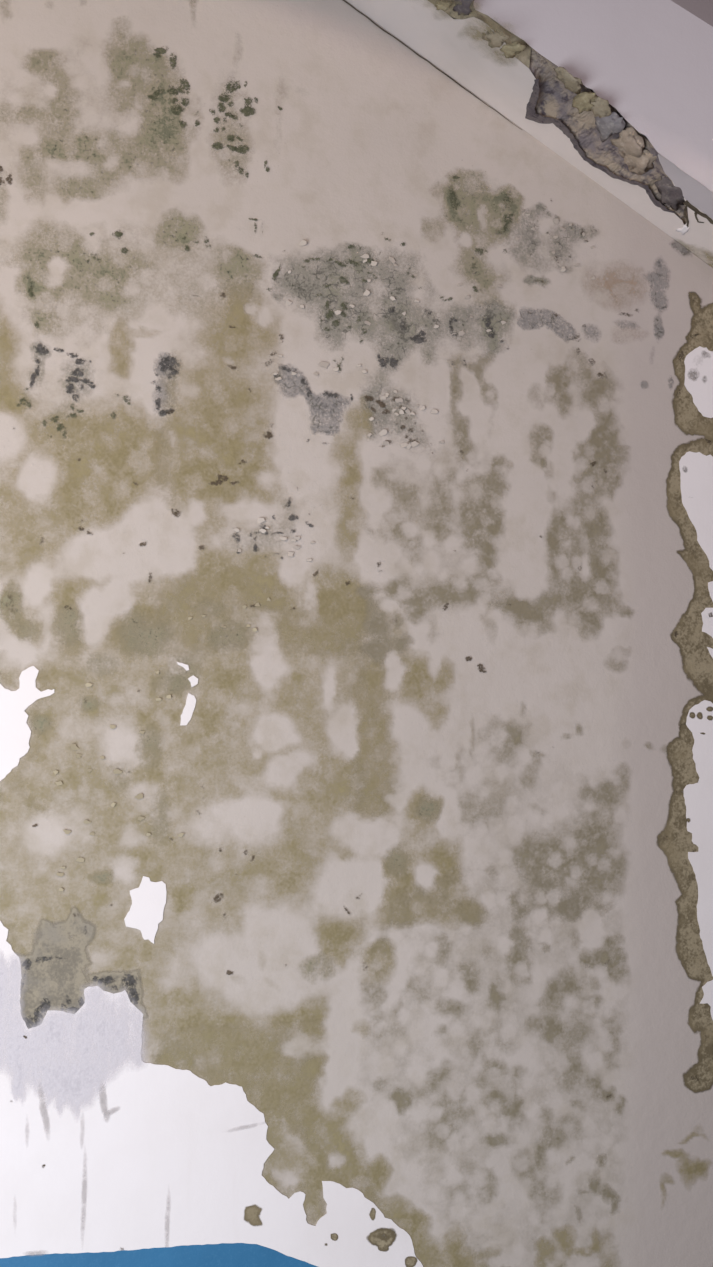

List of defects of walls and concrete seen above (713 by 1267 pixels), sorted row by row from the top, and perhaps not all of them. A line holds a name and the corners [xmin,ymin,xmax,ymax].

leakage [0,31,258,199]
crack [343,0,522,130]
crack [683,200,713,228]
leakage [0,171,597,569]
leakage [495,349,632,633]
peeling [0,666,54,781]
peeling [177,662,198,725]
peeling [657,292,713,1093]
peeling [124,876,167,943]
leakage [0,458,523,1267]
leakage [507,771,628,980]
peeling [0,907,423,1267]